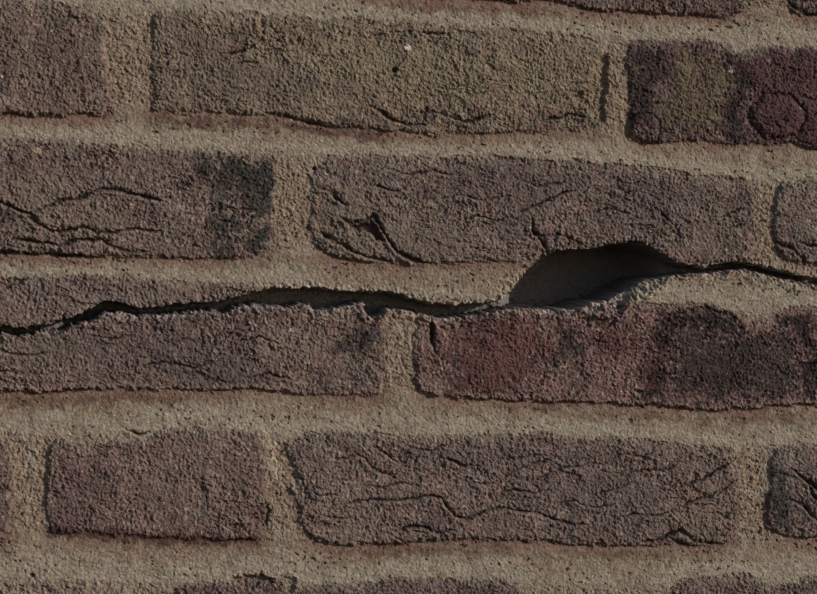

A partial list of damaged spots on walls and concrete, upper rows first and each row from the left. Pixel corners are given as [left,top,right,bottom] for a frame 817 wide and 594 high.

crack [0,168,817,374]
crack [244,371,289,379]